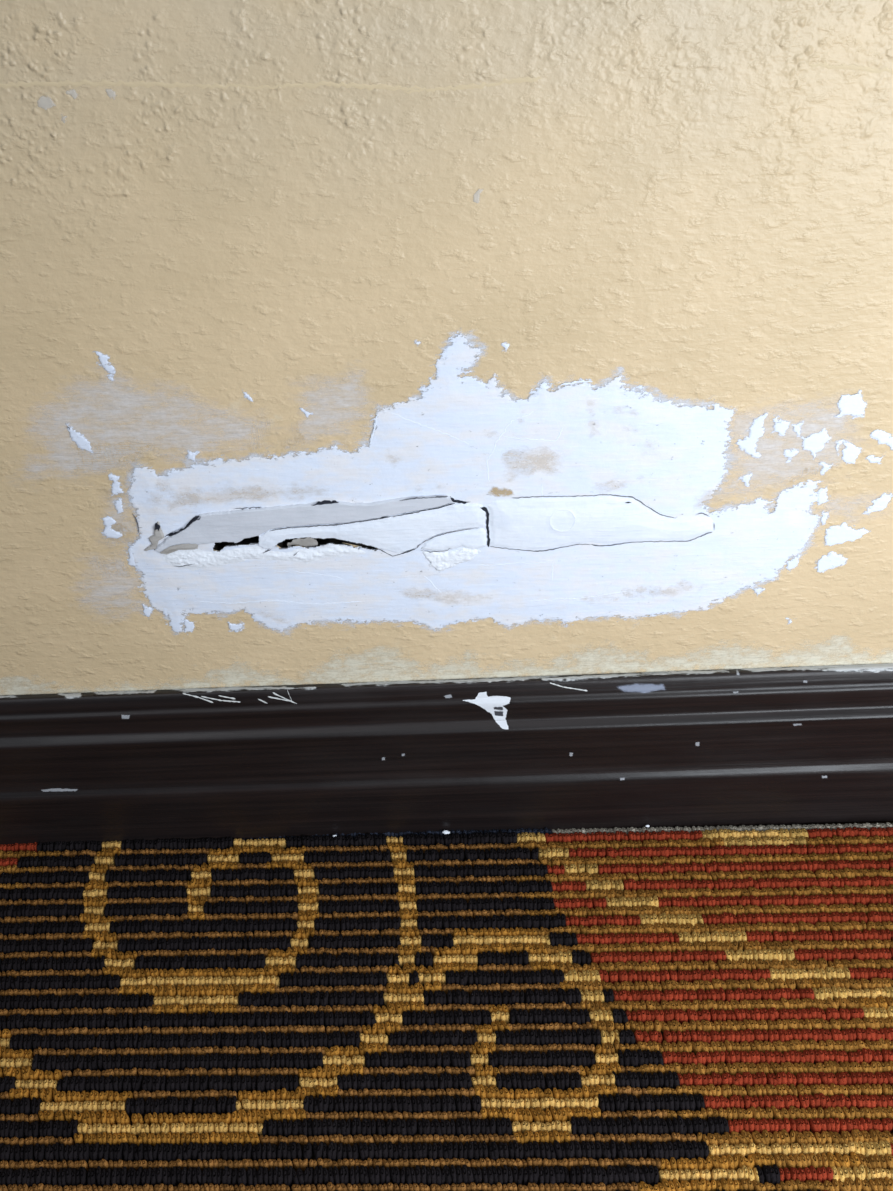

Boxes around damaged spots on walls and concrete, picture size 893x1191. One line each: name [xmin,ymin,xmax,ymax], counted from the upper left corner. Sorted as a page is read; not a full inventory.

peeling [94,351,116,381]
peeling [835,390,867,419]
peeling [735,413,893,573]
peeling [100,473,137,567]
crack [132,513,201,537]
peeling [154,495,488,572]
crack [235,494,715,556]
peeling [140,604,168,625]
peeling [183,619,195,633]
peeling [228,622,245,632]